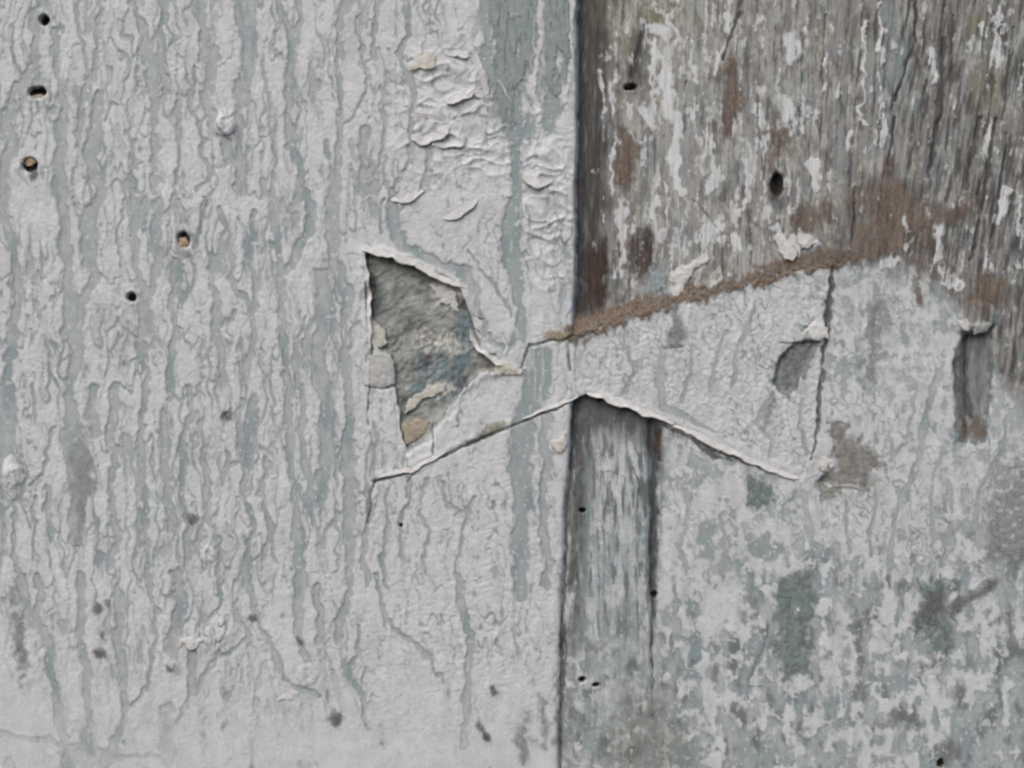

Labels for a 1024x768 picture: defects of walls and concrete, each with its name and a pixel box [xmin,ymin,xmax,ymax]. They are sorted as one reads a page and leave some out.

peeling [410,0,572,130]
peeling [409,112,464,149]
peeling [391,190,424,204]
peeling [443,199,477,220]
peeling [522,173,553,189]
spalling [361,247,524,450]
peeling [773,320,829,399]
crack [780,267,836,460]
peeling [957,318,992,335]
peeling [815,422,888,500]